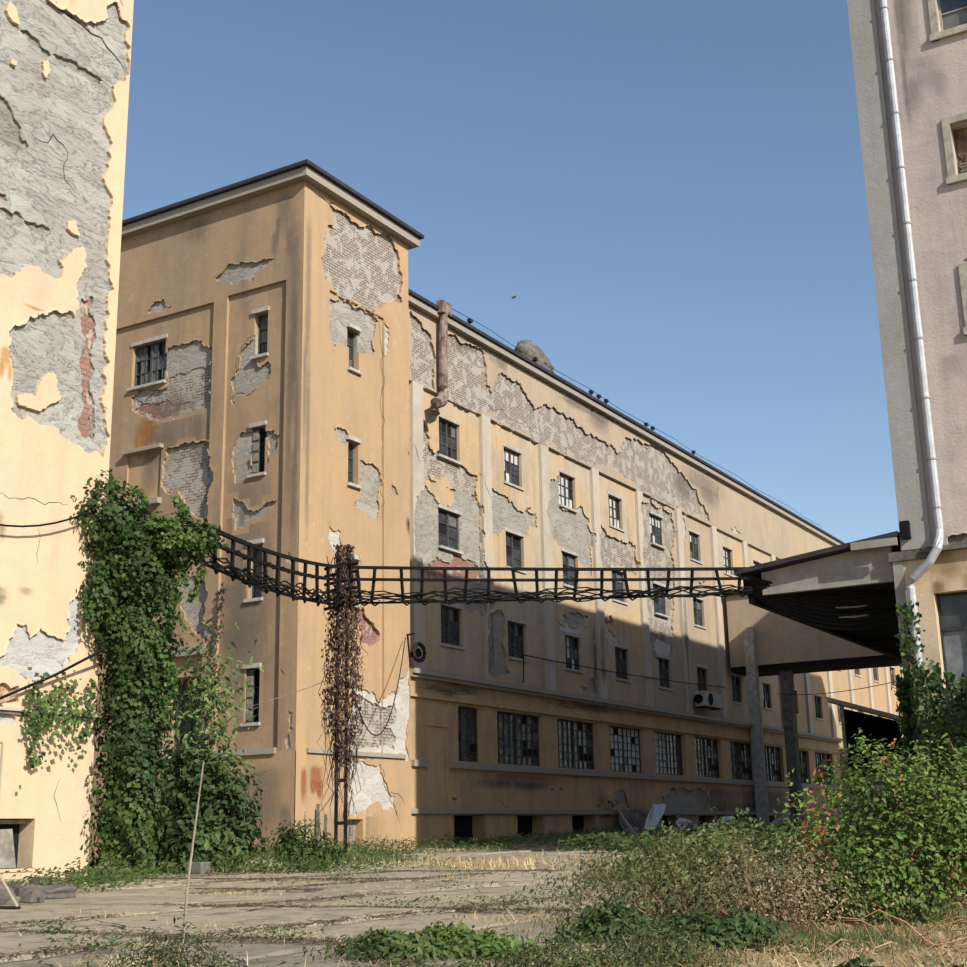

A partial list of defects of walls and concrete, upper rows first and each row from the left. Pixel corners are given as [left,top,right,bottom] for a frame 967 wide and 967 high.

flaking render [0,0,130,455]
flaking render [321,202,402,355]
flaking render [131,338,212,421]
flaking render [409,311,436,388]
flaking render [163,439,213,520]
flaking render [355,458,397,520]
flaking render [414,332,710,679]
flaking render [947,531,967,544]
flaking render [0,592,83,725]
flaking render [355,606,381,646]
corrosion [302,768,322,795]
flaking render [348,667,409,817]